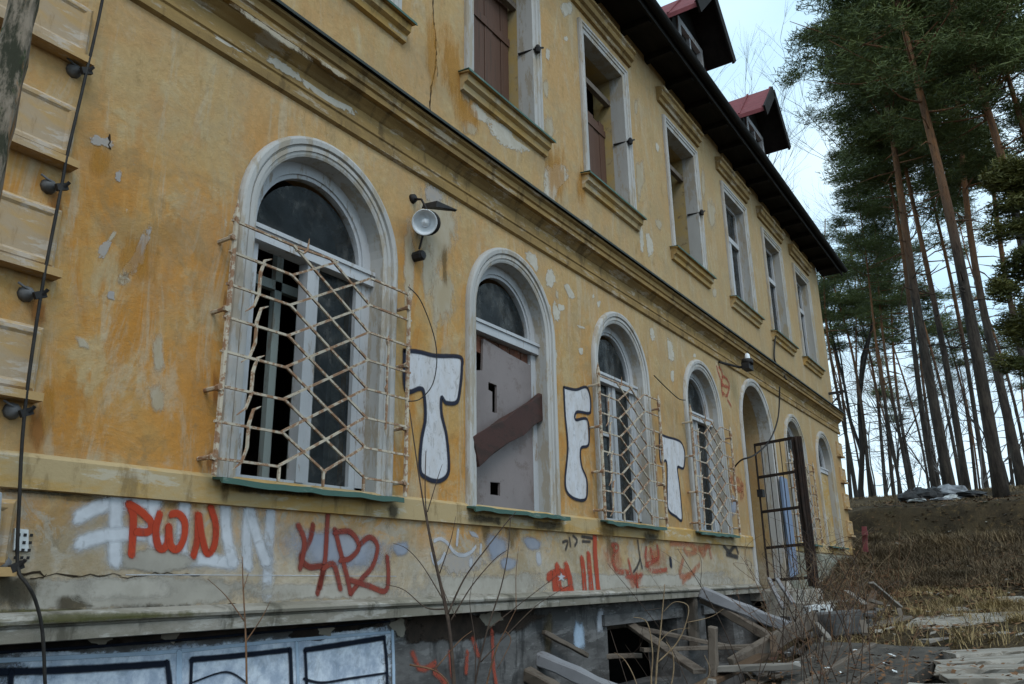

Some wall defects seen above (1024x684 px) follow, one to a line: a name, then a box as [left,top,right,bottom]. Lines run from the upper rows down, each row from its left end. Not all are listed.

flaking render [241,9,307,57]
crack [429,0,438,110]
flaking render [267,56,357,115]
peeling [90,134,113,150]
peeling [462,92,530,153]
peeling [98,232,116,259]
peeling [107,227,151,300]
peeling [525,252,575,321]
peeling [153,336,165,370]
crack [21,571,200,580]
damp [0,577,193,626]